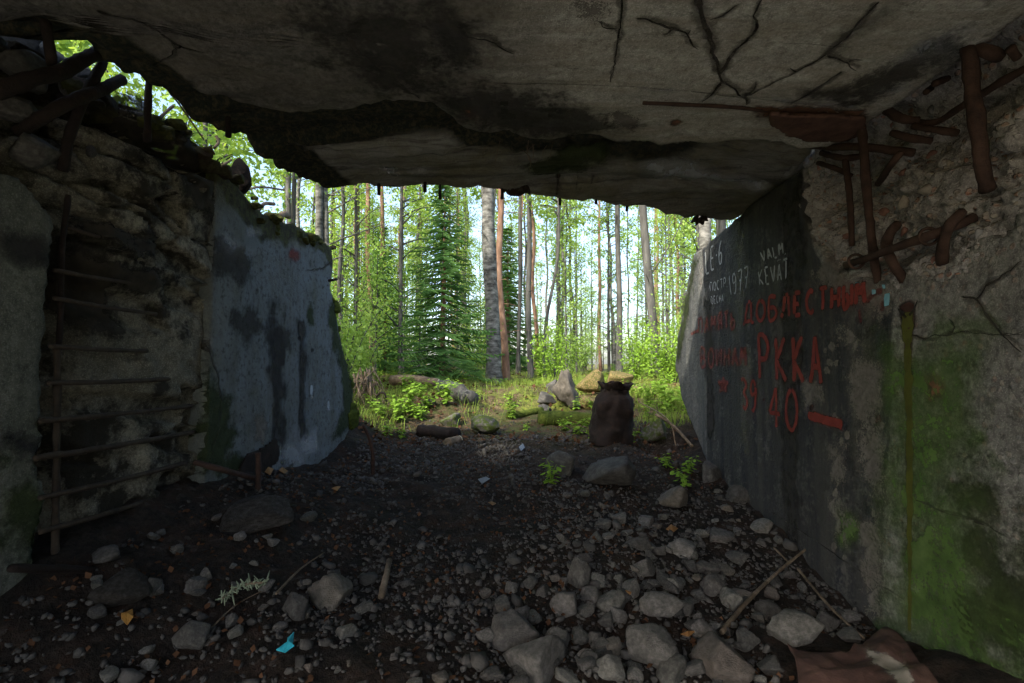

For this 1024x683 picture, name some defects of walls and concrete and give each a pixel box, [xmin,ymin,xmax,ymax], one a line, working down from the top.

spalling [0,36,67,78]
crack [582,0,895,108]
spalling [231,157,252,194]
corrosion [755,105,867,118]
spalling [799,14,1024,290]
spalling [0,81,212,555]
water stain [230,302,316,464]